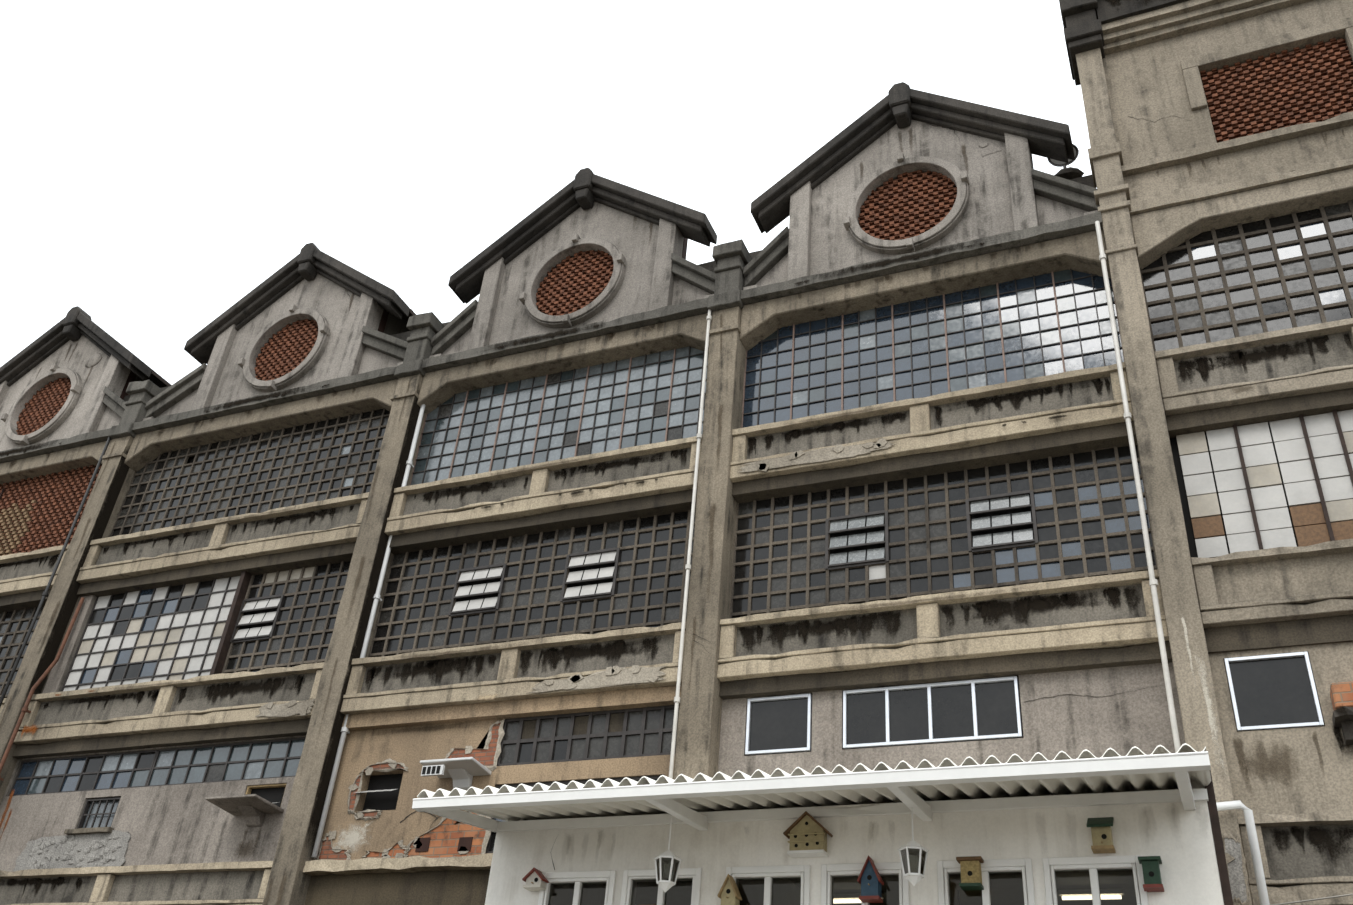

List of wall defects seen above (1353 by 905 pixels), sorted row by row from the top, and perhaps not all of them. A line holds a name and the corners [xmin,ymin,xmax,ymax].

water stain [1178,336,1328,382]
water stain [942,587,1140,625]
water stain [740,611,900,650]
spalling [347,758,408,821]
spalling [315,811,491,860]